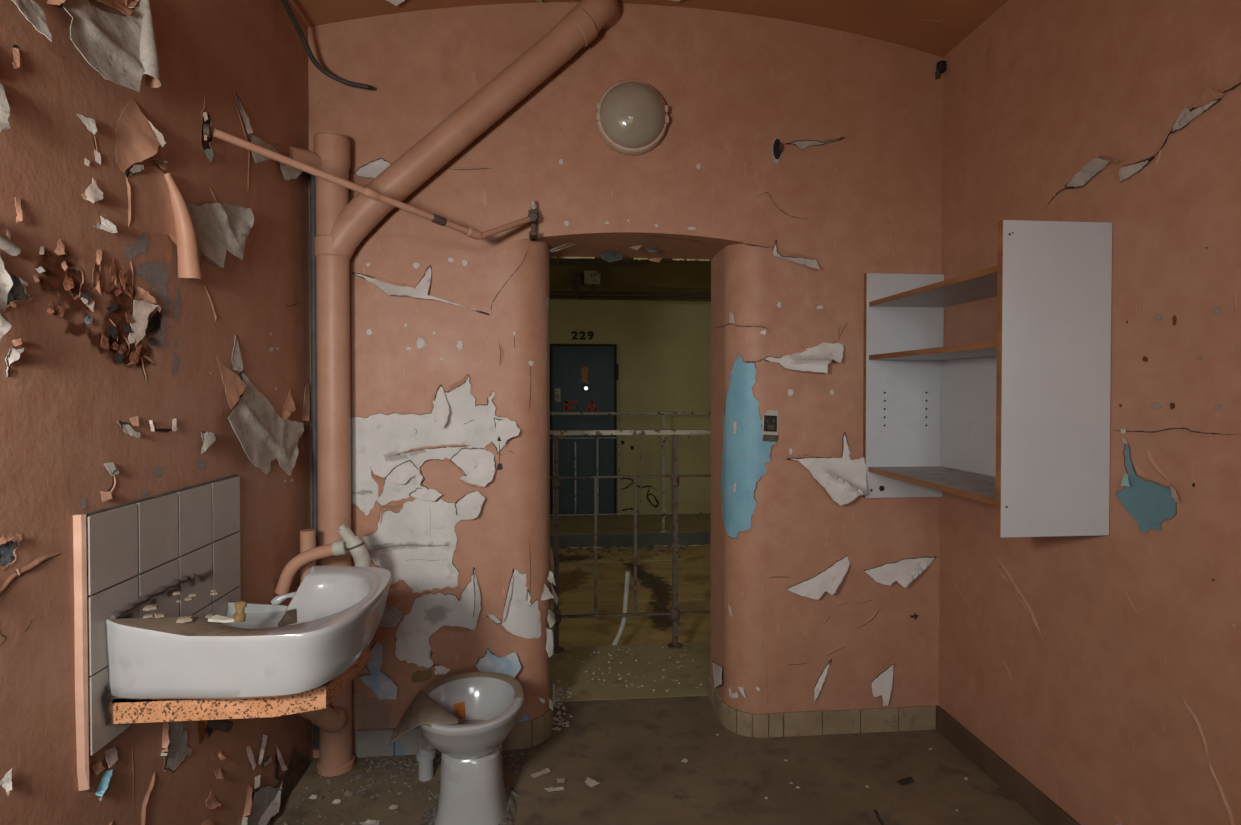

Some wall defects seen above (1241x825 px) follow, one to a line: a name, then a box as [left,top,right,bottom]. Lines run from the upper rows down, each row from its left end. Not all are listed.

peeling [0,0,254,381]
peeling [234,92,302,190]
crack [1110,77,1241,189]
peeling [210,335,310,483]
peeling [720,324,868,540]
crack [1112,428,1241,437]
peeling [1114,438,1180,537]
spalling [351,373,558,710]
peeling [786,556,850,600]
peeling [864,556,936,588]
peeling [814,659,832,703]
peeling [872,663,895,706]